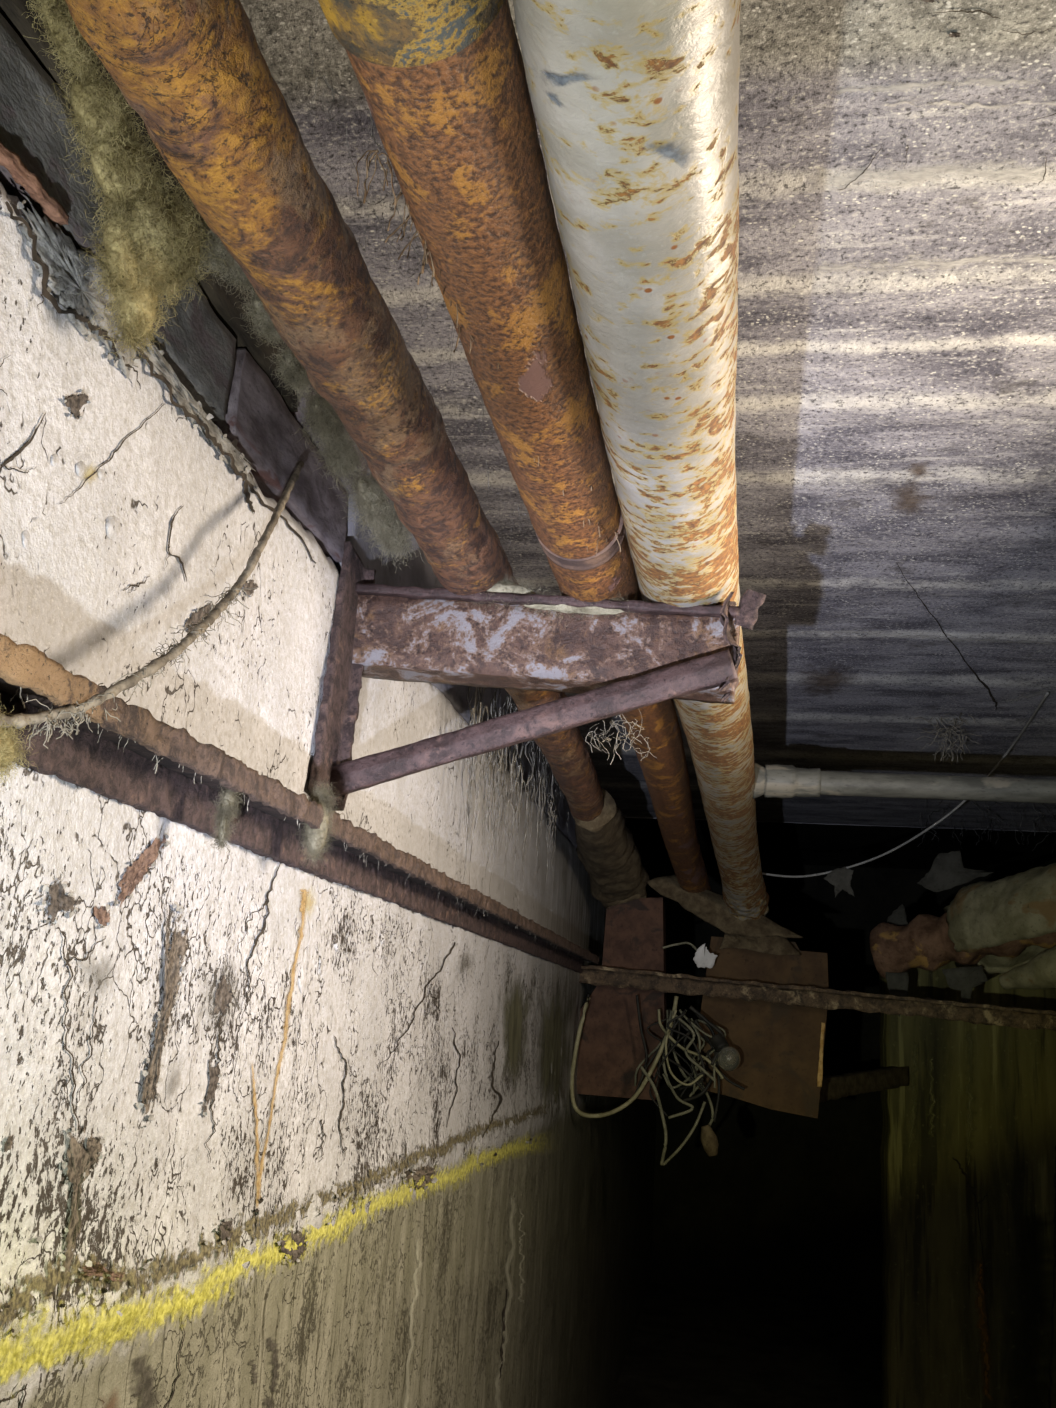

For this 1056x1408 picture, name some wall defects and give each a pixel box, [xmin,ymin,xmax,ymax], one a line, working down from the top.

crack [0,201,316,564]
crack [123,506,187,593]
peeling [42,834,170,928]
crack [61,931,106,1130]
crack [206,862,281,1161]
rust [252,890,312,1207]
crack [319,942,503,1162]
crack [0,1384,27,1408]
crack [165,1317,185,1408]
leakage [0,1136,550,1408]